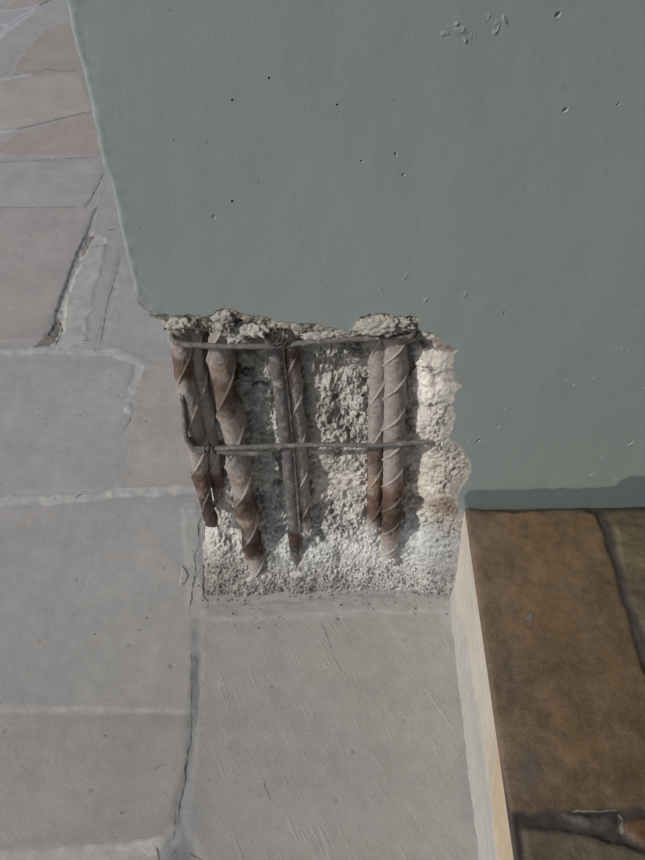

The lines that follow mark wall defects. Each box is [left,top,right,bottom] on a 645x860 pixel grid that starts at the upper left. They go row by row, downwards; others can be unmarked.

spalling [149,308,472,598]
rust [366,449,383,471]
rust [191,472,224,492]
rust [242,539,263,555]